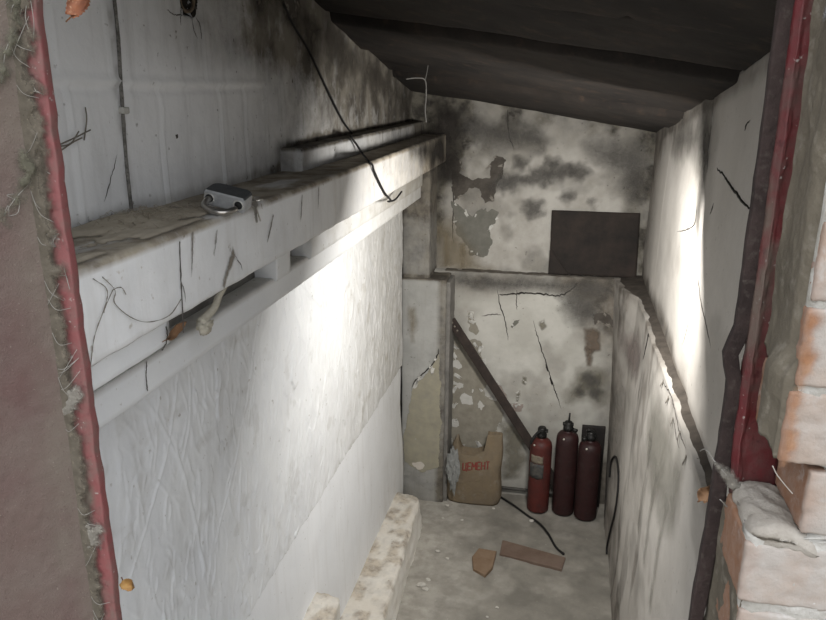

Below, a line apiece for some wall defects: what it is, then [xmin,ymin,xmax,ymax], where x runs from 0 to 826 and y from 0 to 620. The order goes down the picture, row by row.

peeling [451,155,506,257]
water stain [526,201,542,219]
water stain [495,159,589,191]
crack [717,168,750,209]
crack [484,283,578,335]
peeling [403,354,442,472]
flaking render [452,311,527,448]
crack [533,321,561,407]